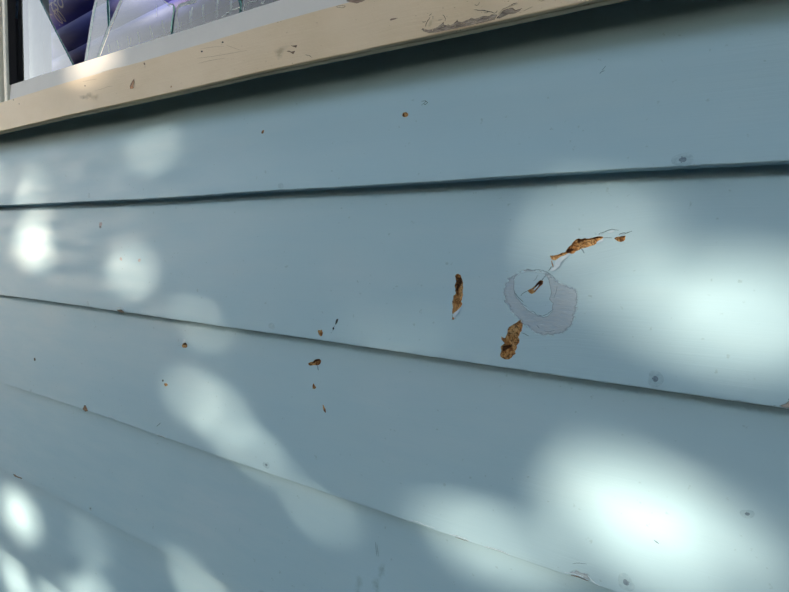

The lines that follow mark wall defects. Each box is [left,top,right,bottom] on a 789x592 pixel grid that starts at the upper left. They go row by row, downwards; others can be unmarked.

peeling [422,0,543,33]
spalling [521,236,603,295]
spalling [452,274,463,320]
spalling [500,320,528,359]